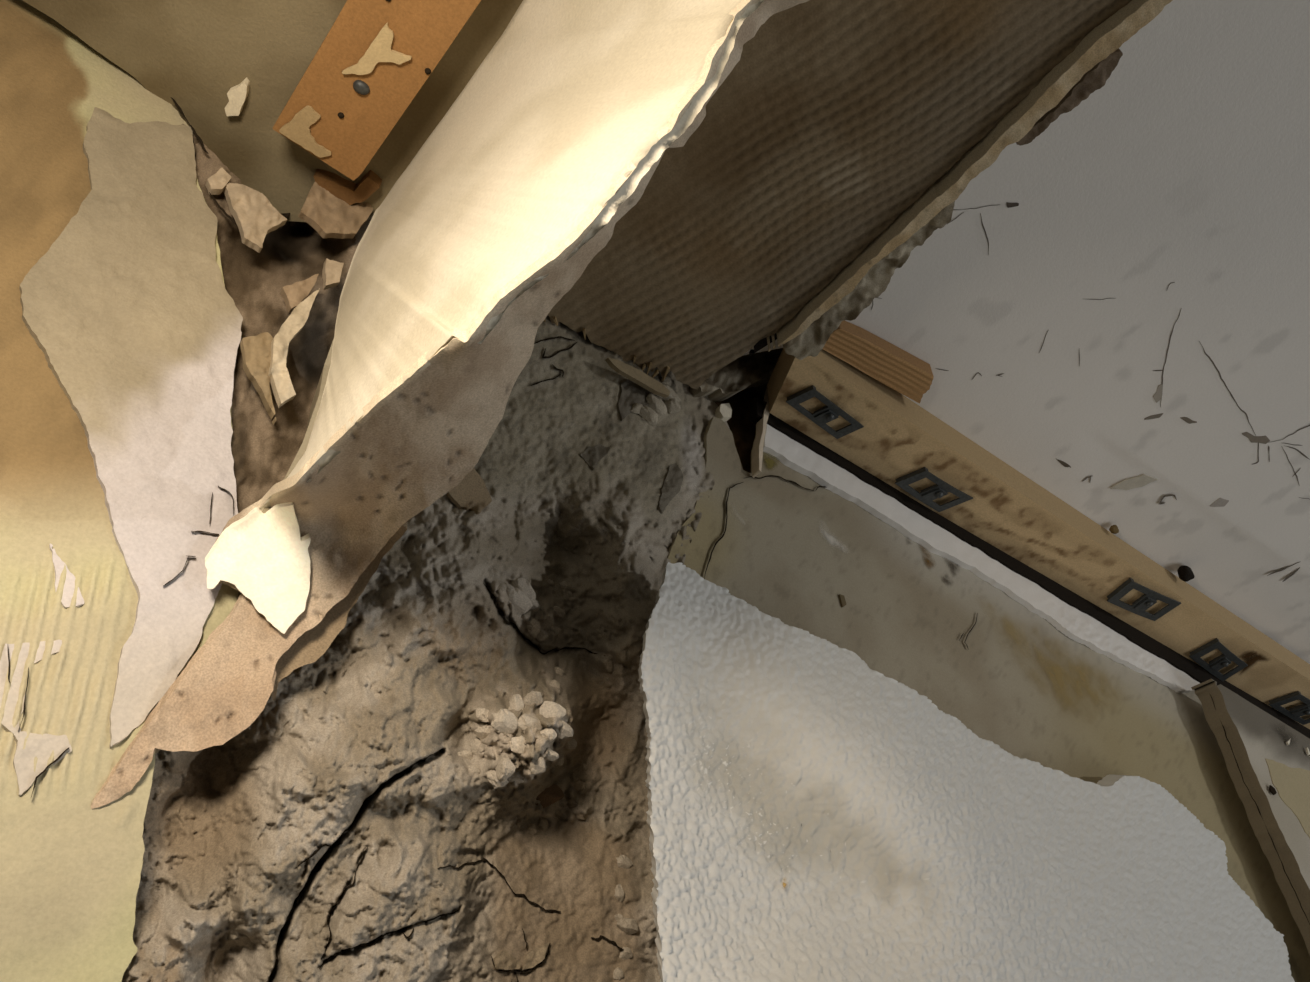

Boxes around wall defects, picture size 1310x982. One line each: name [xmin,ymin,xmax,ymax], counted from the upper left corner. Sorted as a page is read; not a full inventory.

crack [1154,282,1310,499]
spalling [19,0,809,982]
crack [704,475,827,579]
peeling [0,640,72,796]
crack [269,749,460,982]
crack [438,858,561,982]
peeling [1265,759,1310,838]